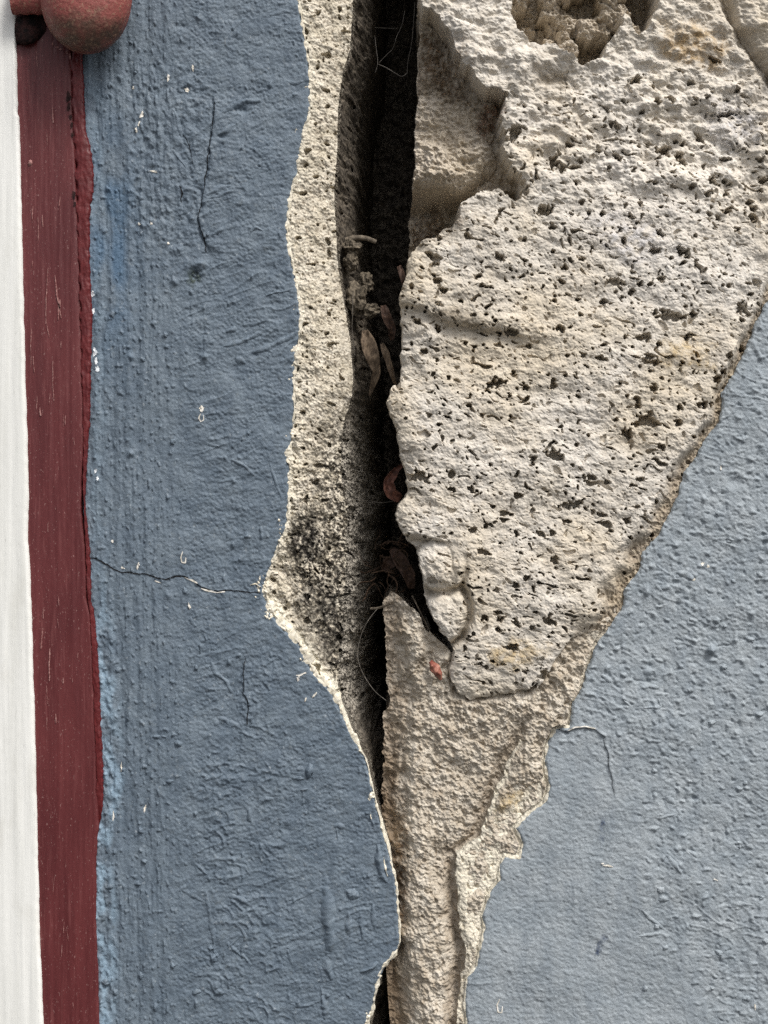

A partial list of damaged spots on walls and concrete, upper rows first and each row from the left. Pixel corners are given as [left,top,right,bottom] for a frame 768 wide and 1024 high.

crack [90,0,445,1024]
spalling [251,0,768,1024]
crack [551,726,615,795]